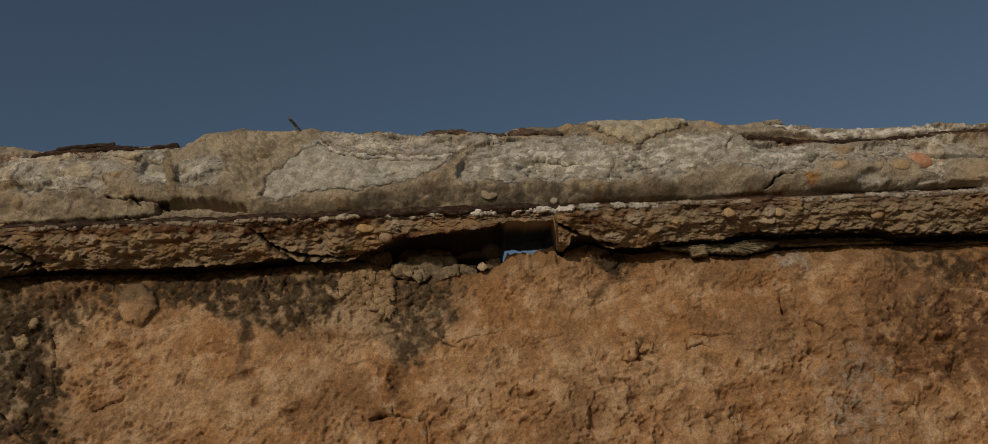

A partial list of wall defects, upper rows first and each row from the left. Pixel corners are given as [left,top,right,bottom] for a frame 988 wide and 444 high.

rust [0,142,180,161]
spalling [259,117,988,202]
rust [746,129,988,148]
crack [61,196,170,223]
crack [0,222,42,268]
crack [261,233,330,260]
crack [650,228,988,246]